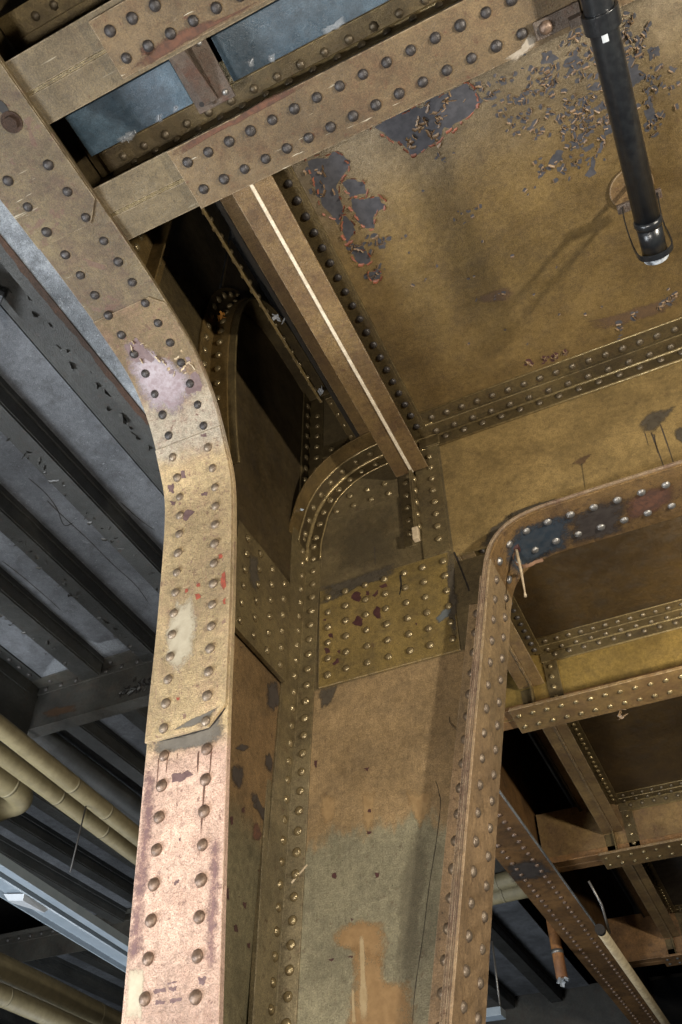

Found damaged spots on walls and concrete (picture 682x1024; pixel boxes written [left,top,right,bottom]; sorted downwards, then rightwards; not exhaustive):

peeling [370,28,612,196]
peeling [620,10,681,138]
peeling [303,151,408,284]
peeling [124,338,203,414]
water stain [640,407,682,465]
corrosion [335,921,412,1024]